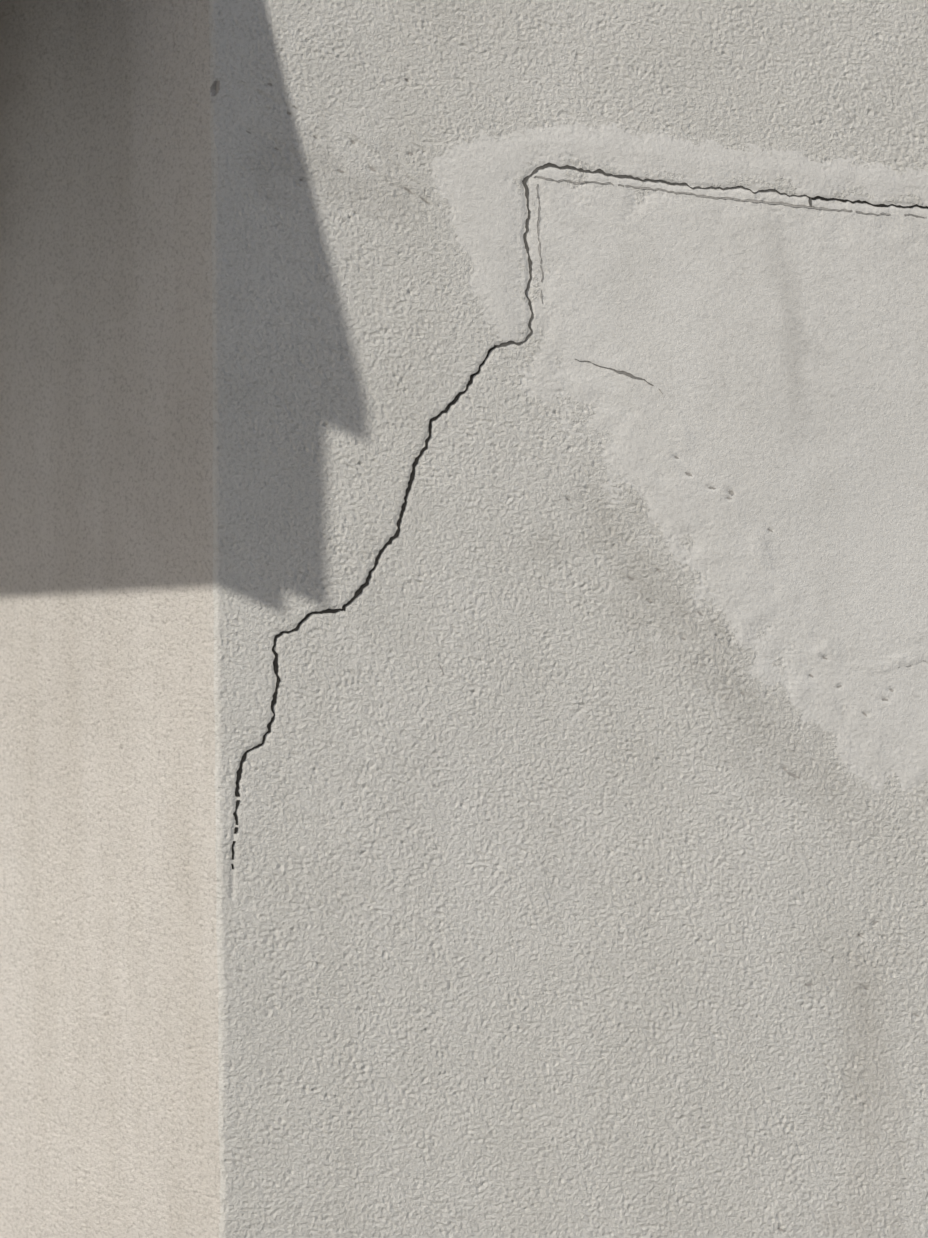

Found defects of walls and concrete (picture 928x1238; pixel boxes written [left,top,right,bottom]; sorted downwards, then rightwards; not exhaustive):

crack [231,163,928,869]